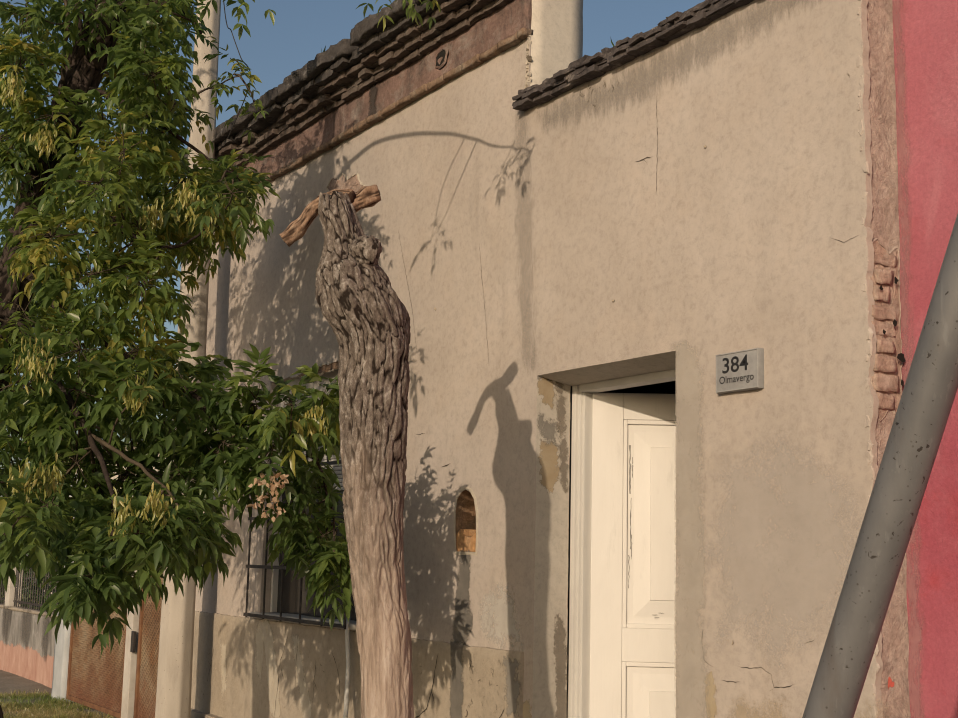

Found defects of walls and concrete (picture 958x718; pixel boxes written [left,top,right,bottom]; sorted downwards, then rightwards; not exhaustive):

spalling [861,238,906,428]
peeling [538,377,555,408]
crack [416,656,438,718]
crack [702,630,792,690]
spalling [870,643,880,718]